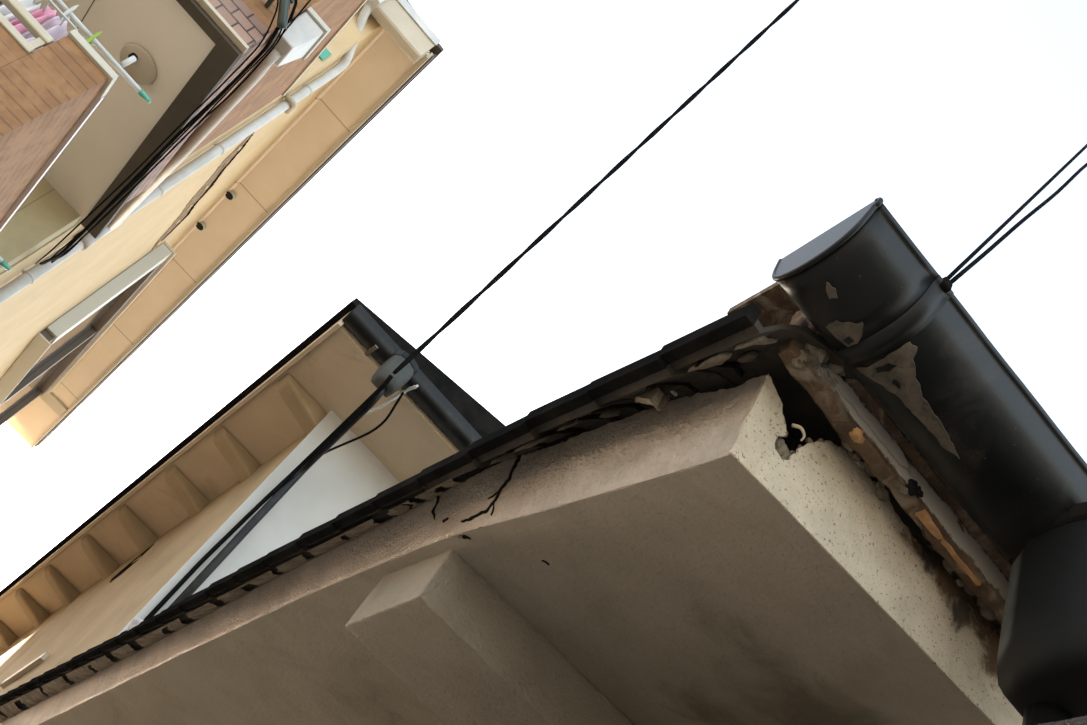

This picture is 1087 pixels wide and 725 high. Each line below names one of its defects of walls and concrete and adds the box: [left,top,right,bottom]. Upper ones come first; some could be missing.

peeling [826,320,863,347]
peeling [791,342,960,459]
crack [401,455,521,523]
spalling [775,422,890,501]